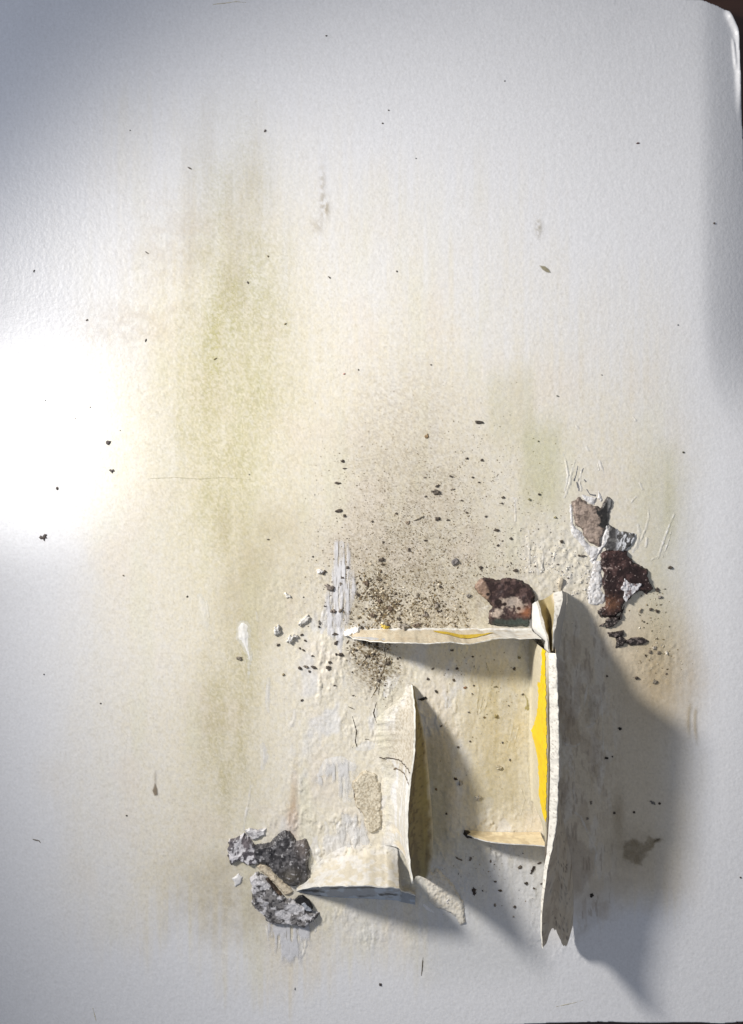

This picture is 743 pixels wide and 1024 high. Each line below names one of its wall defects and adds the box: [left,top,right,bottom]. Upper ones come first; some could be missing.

peeling [227,673,466,962]
peeling [274,530,574,948]